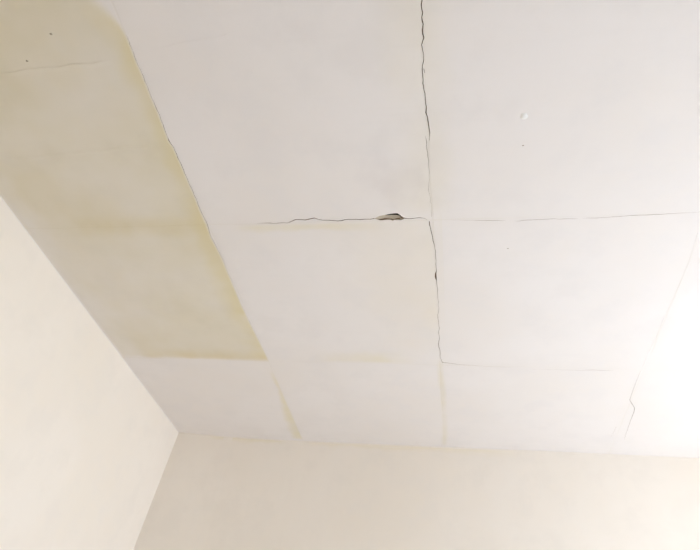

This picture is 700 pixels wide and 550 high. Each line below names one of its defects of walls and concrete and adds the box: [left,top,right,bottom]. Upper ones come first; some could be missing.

crack [420,0,431,167]
water stain [0,0,535,460]
crack [261,216,374,224]
flaking render [374,213,405,222]
crack [401,187,489,367]